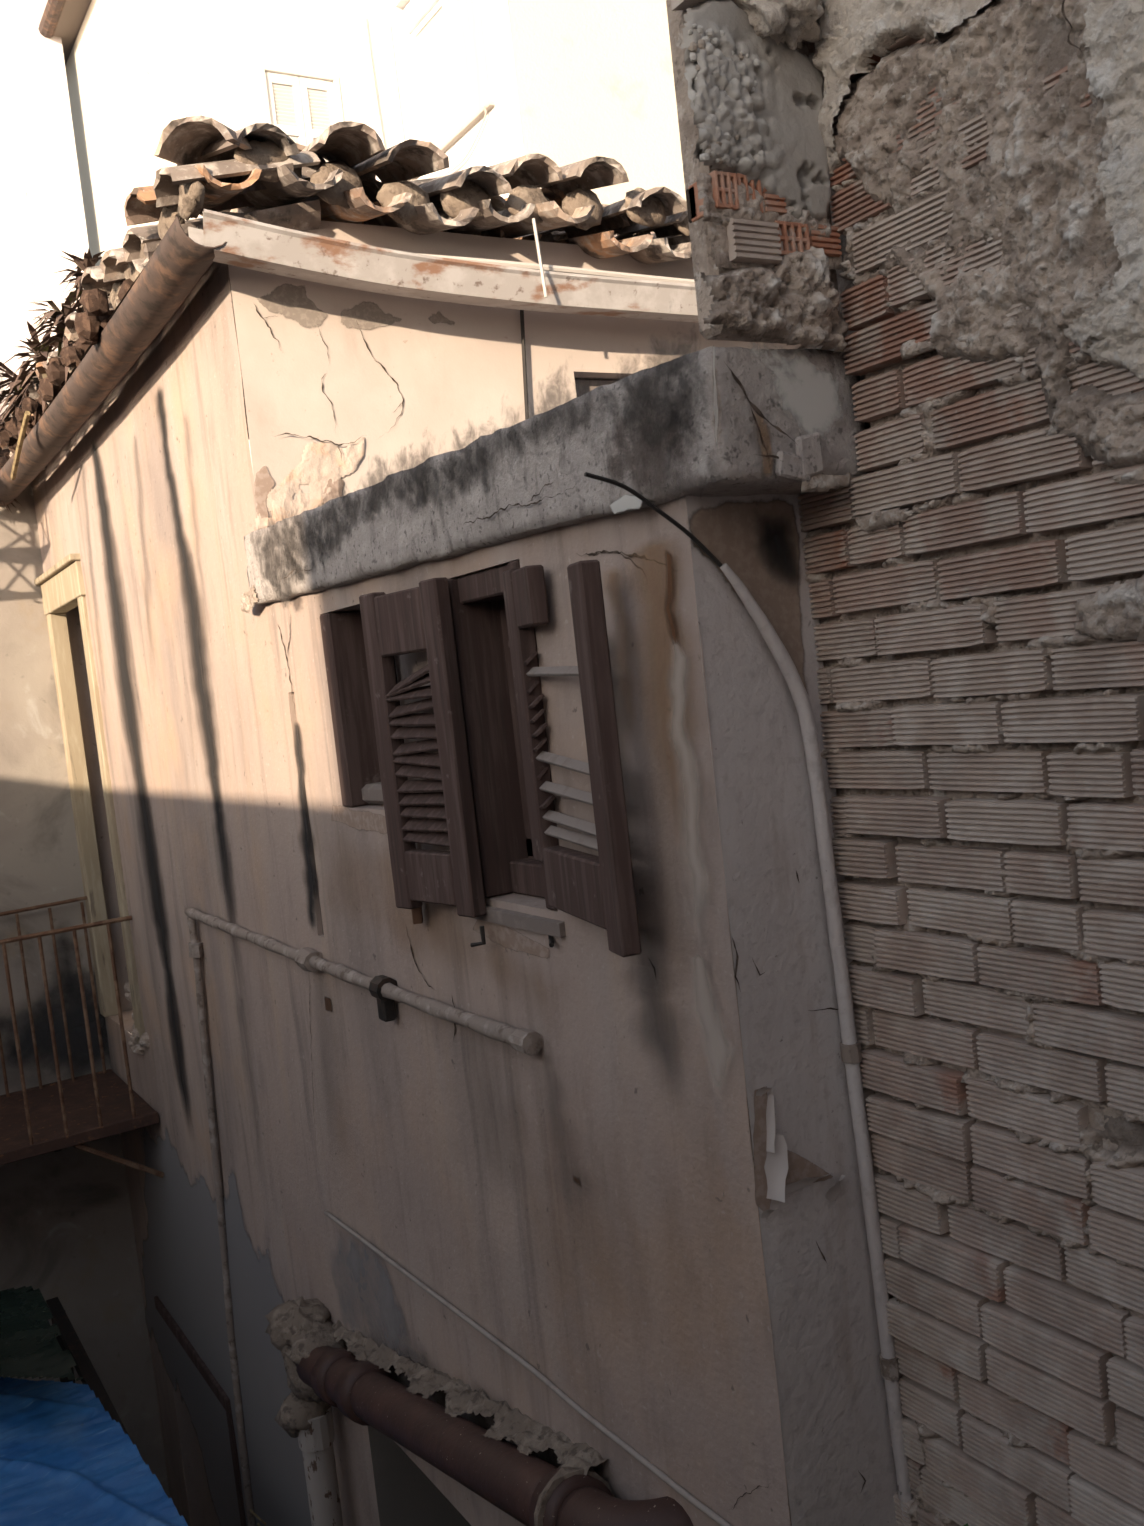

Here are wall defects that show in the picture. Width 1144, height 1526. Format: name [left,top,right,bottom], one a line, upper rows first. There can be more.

spalling [693,49,763,167]
peeling [259,284,402,330]
spalling [685,186,697,223]
spalling [831,0,1144,469]
crack [271,314,404,460]
spalling [254,437,365,529]
water stain [256,336,718,606]
water stain [157,391,233,923]
peeling [689,472,850,694]
spalling [1074,574,1144,642]
water stain [92,444,189,1114]
peeling [753,1087,845,1219]